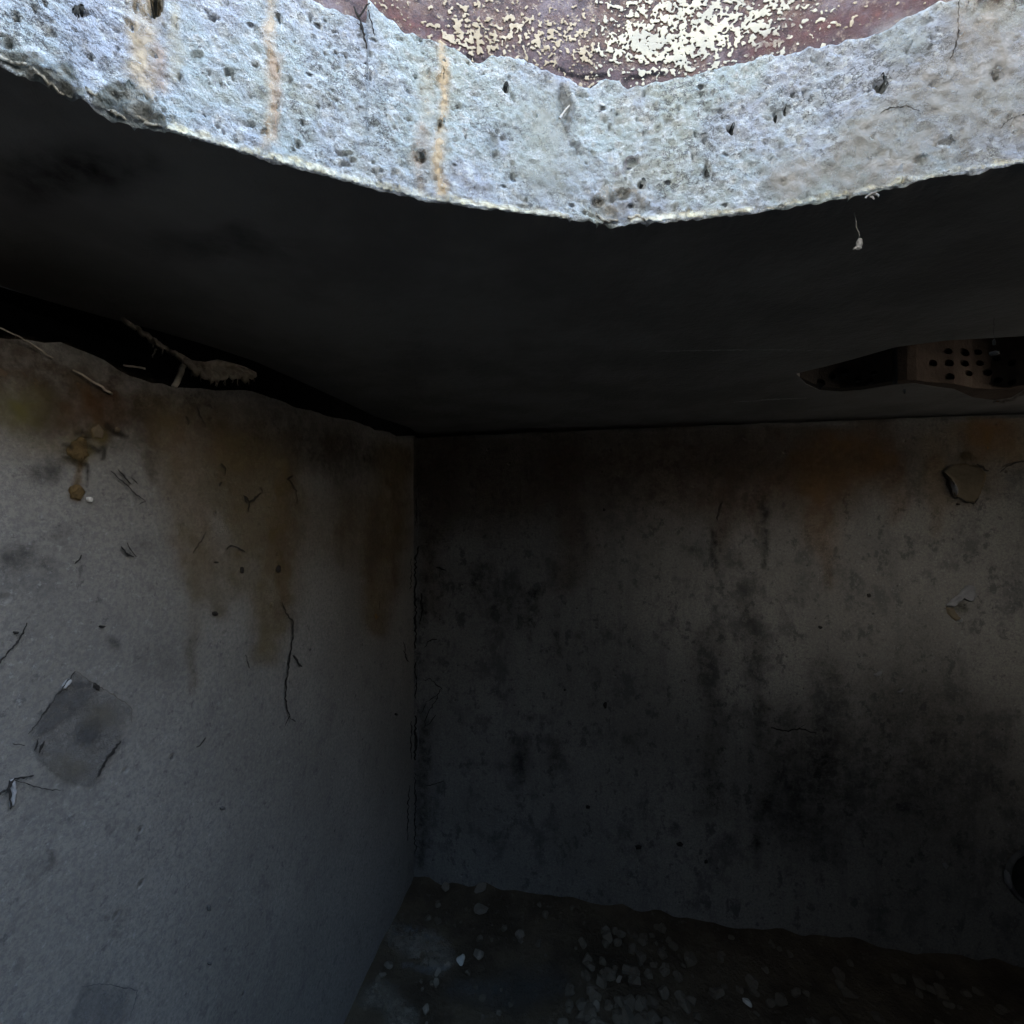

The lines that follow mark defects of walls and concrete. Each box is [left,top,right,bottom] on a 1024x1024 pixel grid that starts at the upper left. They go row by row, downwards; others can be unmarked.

spalling [72,3,85,18]
spalling [0,51,167,128]
spalling [150,0,163,19]
rust [363,0,485,121]
rust [556,67,608,80]
peeling [367,0,881,88]
spalling [874,72,890,95]
crack [950,0,969,59]
crack [0,623,27,664]
crack [282,603,302,725]
crack [403,478,446,854]
crack [0,739,61,809]